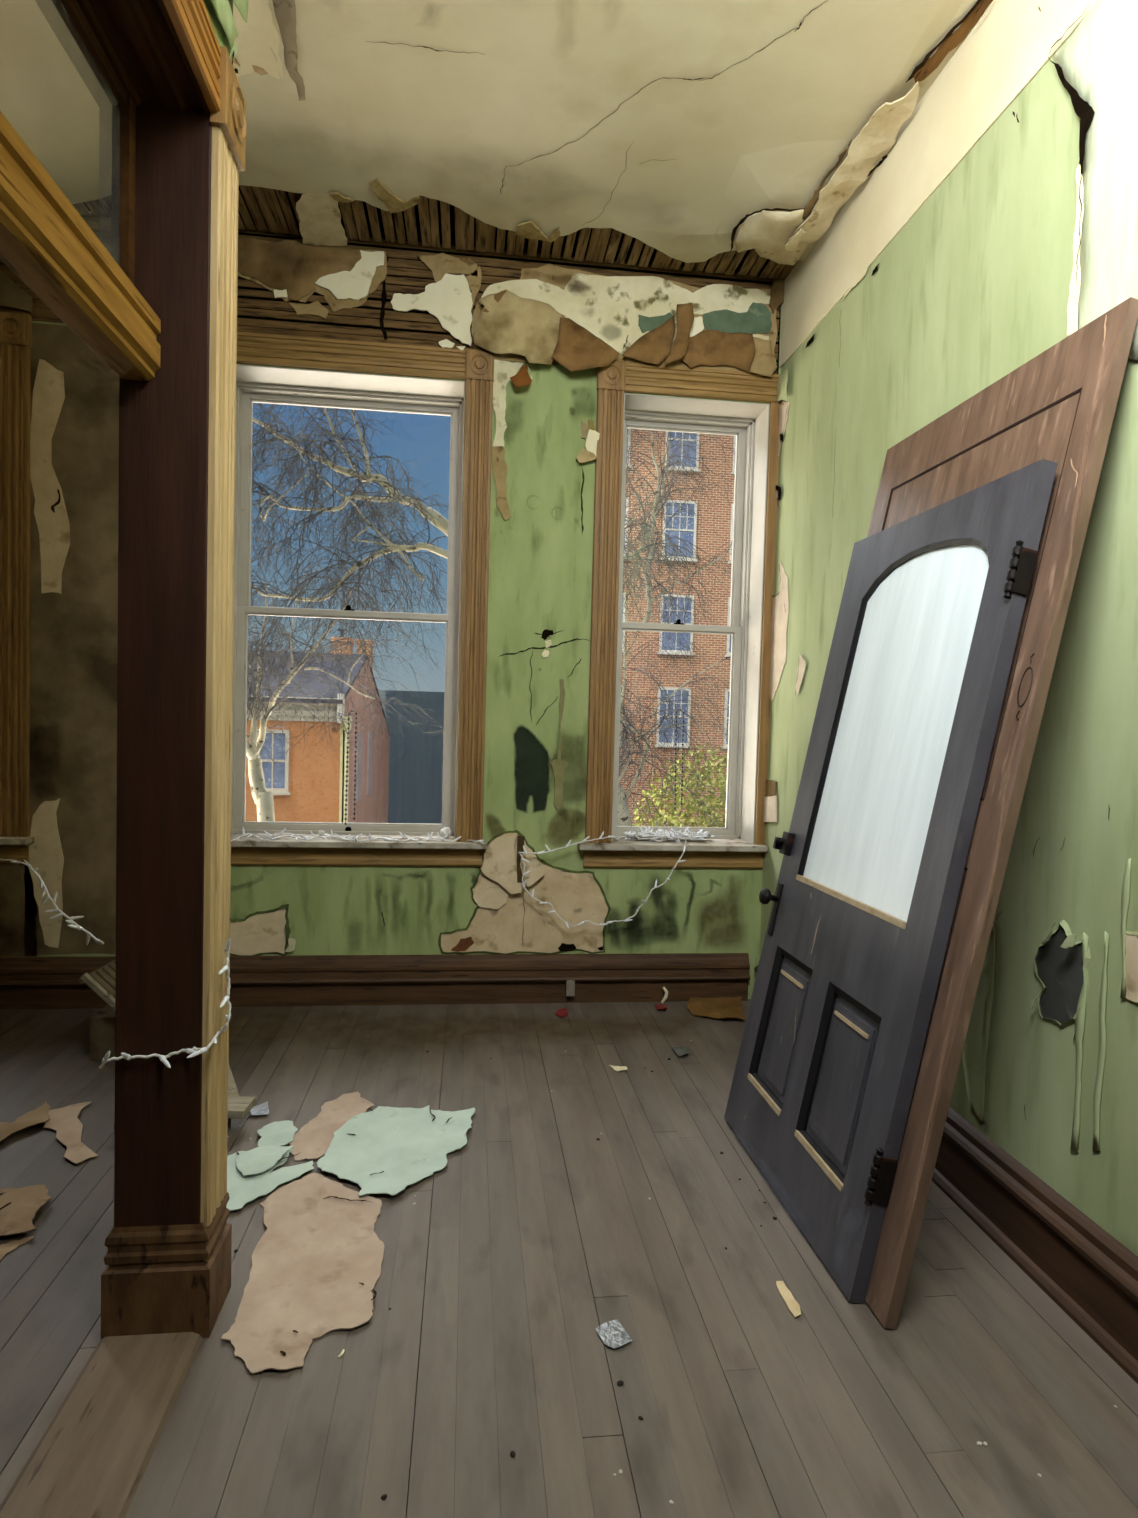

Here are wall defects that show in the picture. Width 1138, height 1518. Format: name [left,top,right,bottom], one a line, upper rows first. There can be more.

flaking render [233,0,995,351]
crack [500,0,828,226]
peeling [1052,0,1138,330]
peeling [492,360,533,521]
peeling [576,420,600,463]
peeling [773,305,790,457]
peeling [770,561,806,702]
damp [514,726,558,812]
peeling [763,780,777,822]
peeling [230,904,296,956]
flaking render [438,830,611,955]
peeling [1038,858,1138,1151]